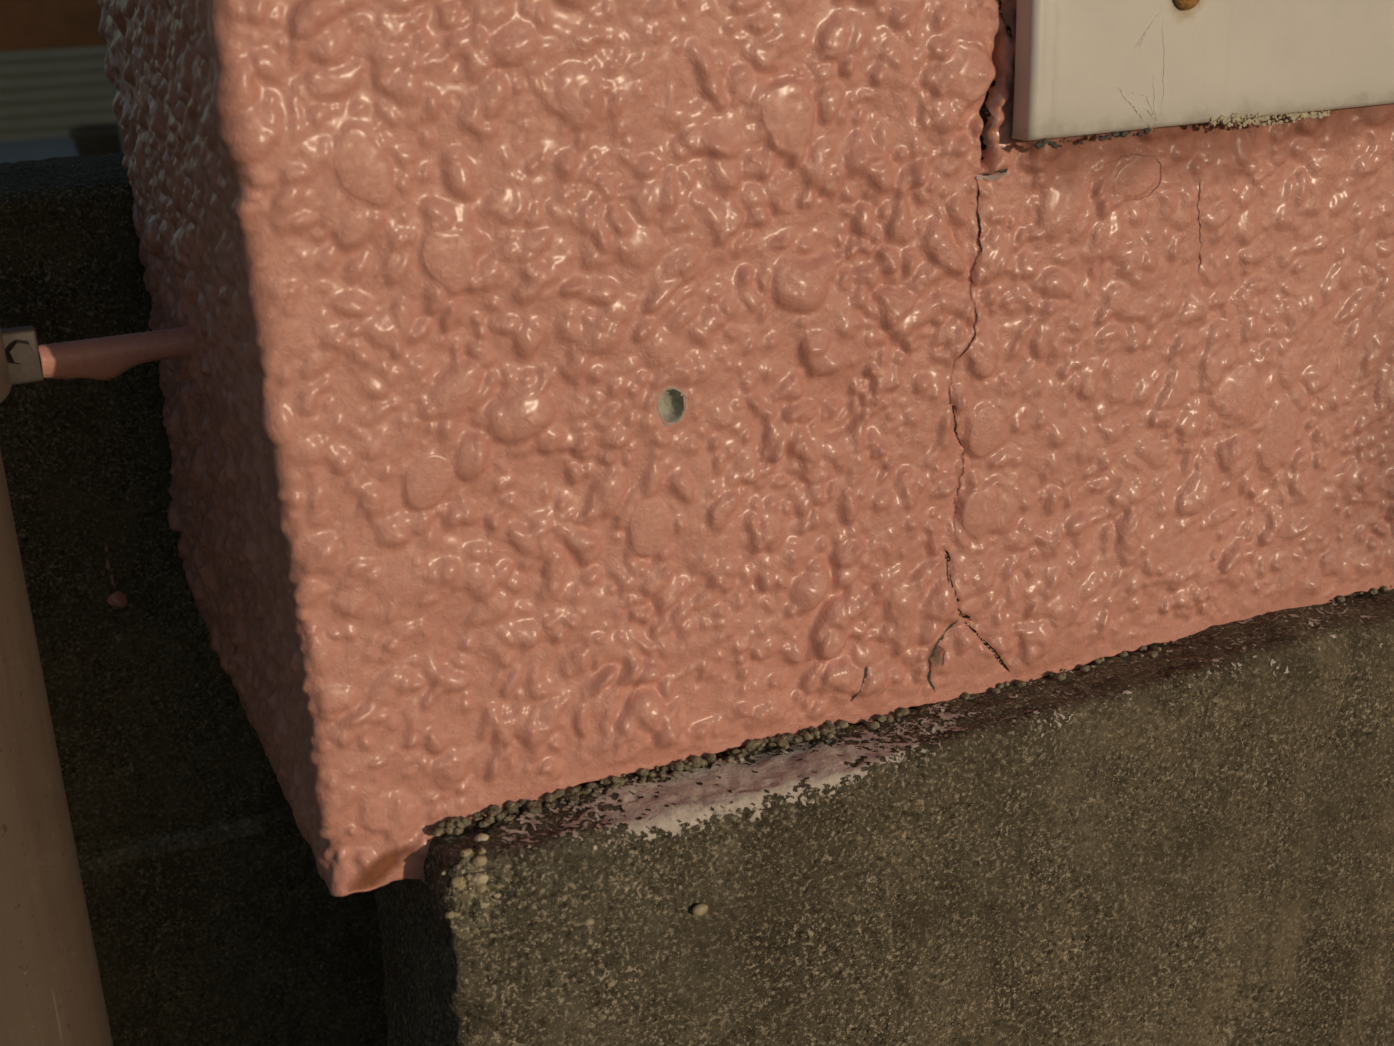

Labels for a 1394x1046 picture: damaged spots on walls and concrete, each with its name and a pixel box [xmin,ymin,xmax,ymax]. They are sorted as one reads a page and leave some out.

crack [995,0,1012,37]
crack [927,80,1010,691]